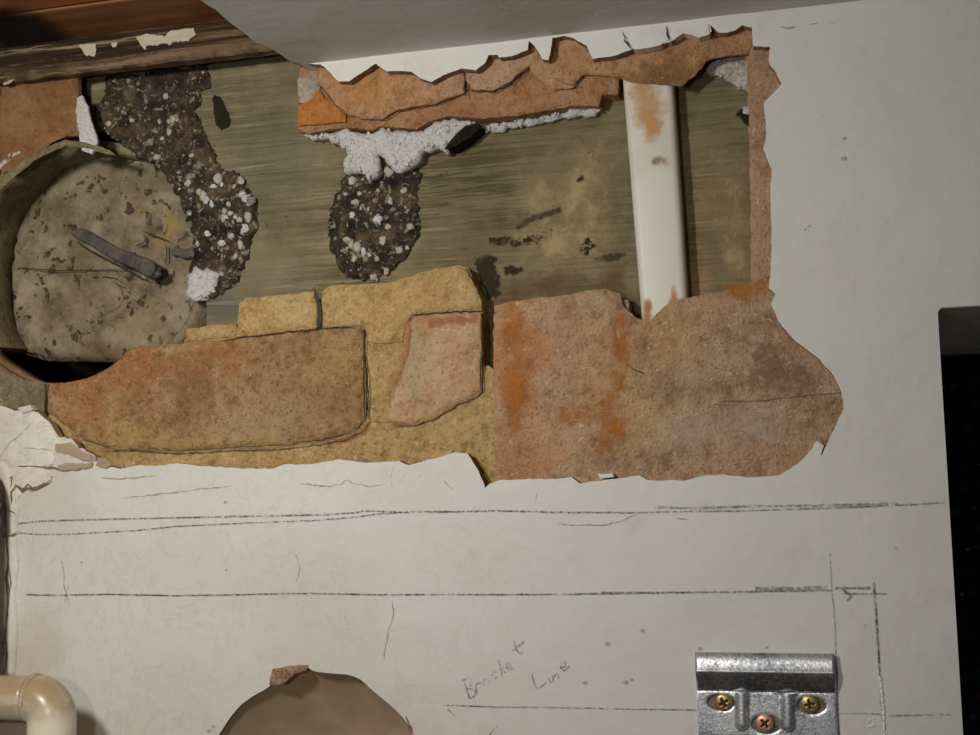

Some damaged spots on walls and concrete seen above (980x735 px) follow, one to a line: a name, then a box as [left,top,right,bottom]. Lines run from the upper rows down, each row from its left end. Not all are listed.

peeling [126,79,181,168]
peeling [169,153,256,264]
flaking render [297,24,843,483]
peeling [0,384,111,501]
crack [3,434,67,675]
peeling [269,665,309,685]